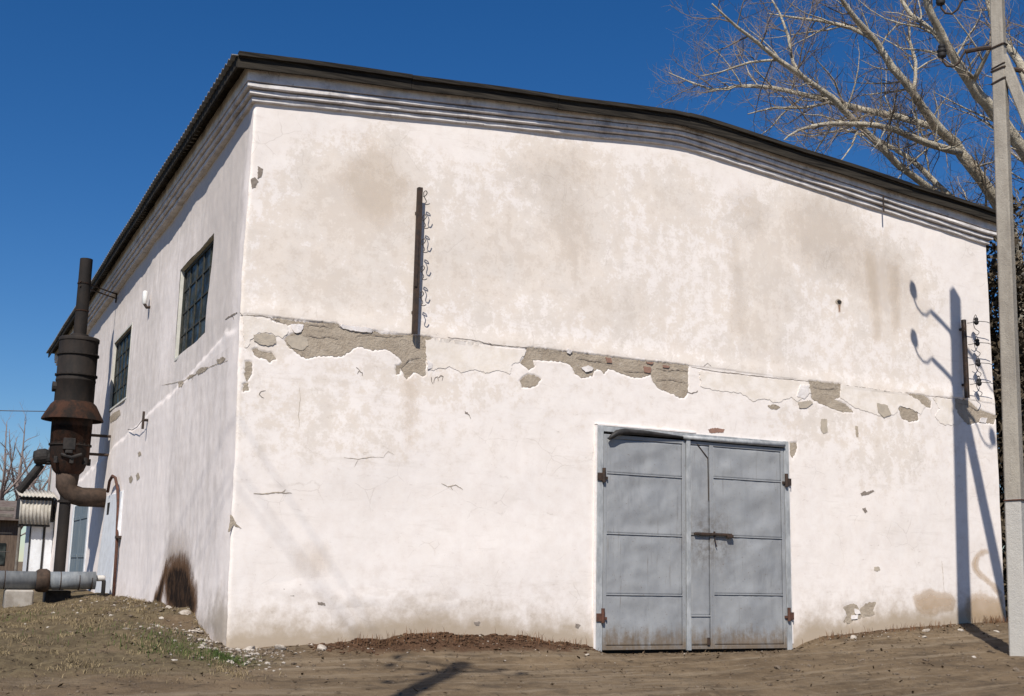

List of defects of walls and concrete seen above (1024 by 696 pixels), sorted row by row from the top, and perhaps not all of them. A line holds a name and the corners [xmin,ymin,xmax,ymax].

spalling [178,357,225,387]
spalling [243,315,689,398]
peeling [797,380,997,434]
leakage [154,554,197,615]
spalling [843,602,876,624]